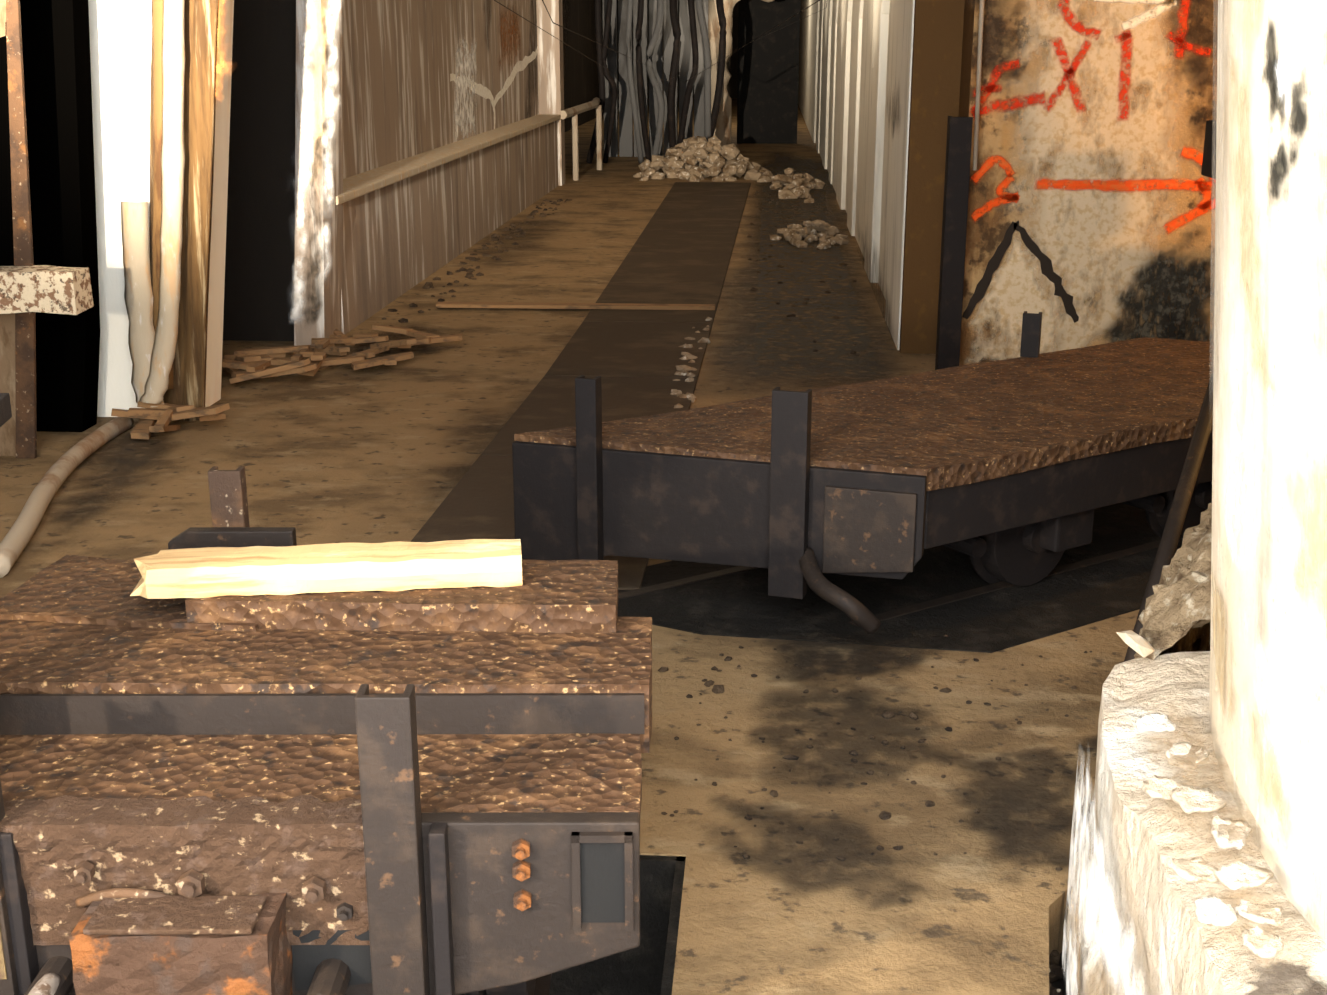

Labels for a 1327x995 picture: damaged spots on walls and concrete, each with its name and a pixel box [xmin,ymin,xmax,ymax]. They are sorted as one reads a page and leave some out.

leakage [1107,255,1213,343]